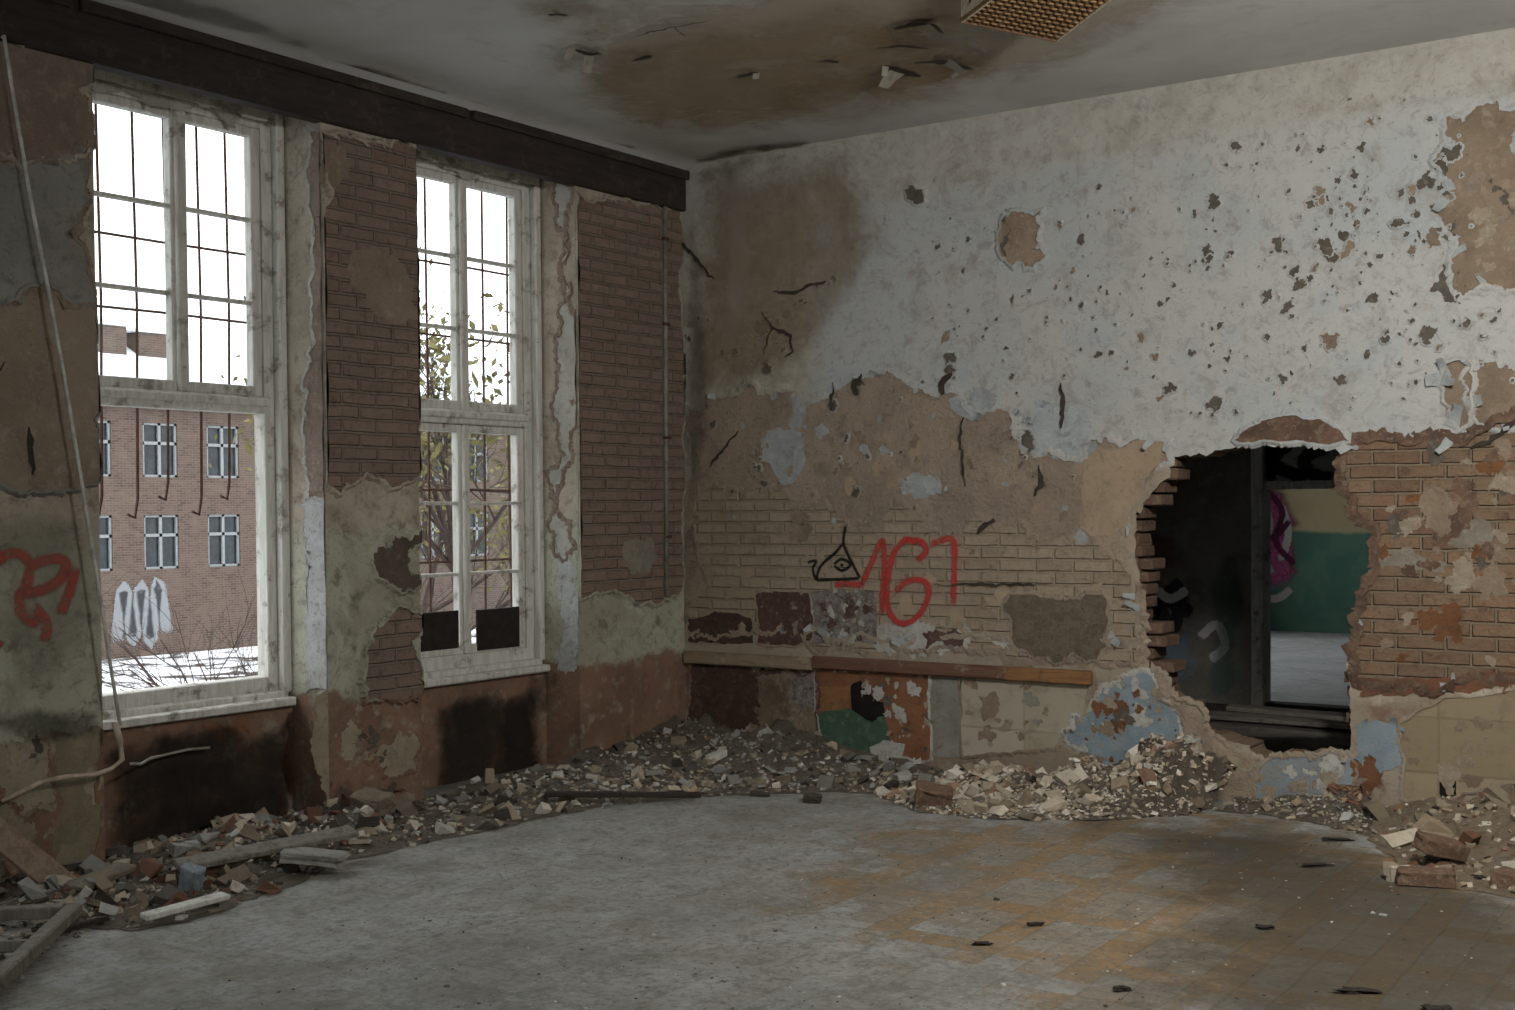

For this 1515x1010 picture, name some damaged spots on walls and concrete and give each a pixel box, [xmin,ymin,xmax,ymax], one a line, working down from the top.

water stain [586,0,1152,127]
flaking render [0,41,102,499]
crack [761,280,826,357]
flaking render [300,92,1515,807]
peeling [0,719,104,865]